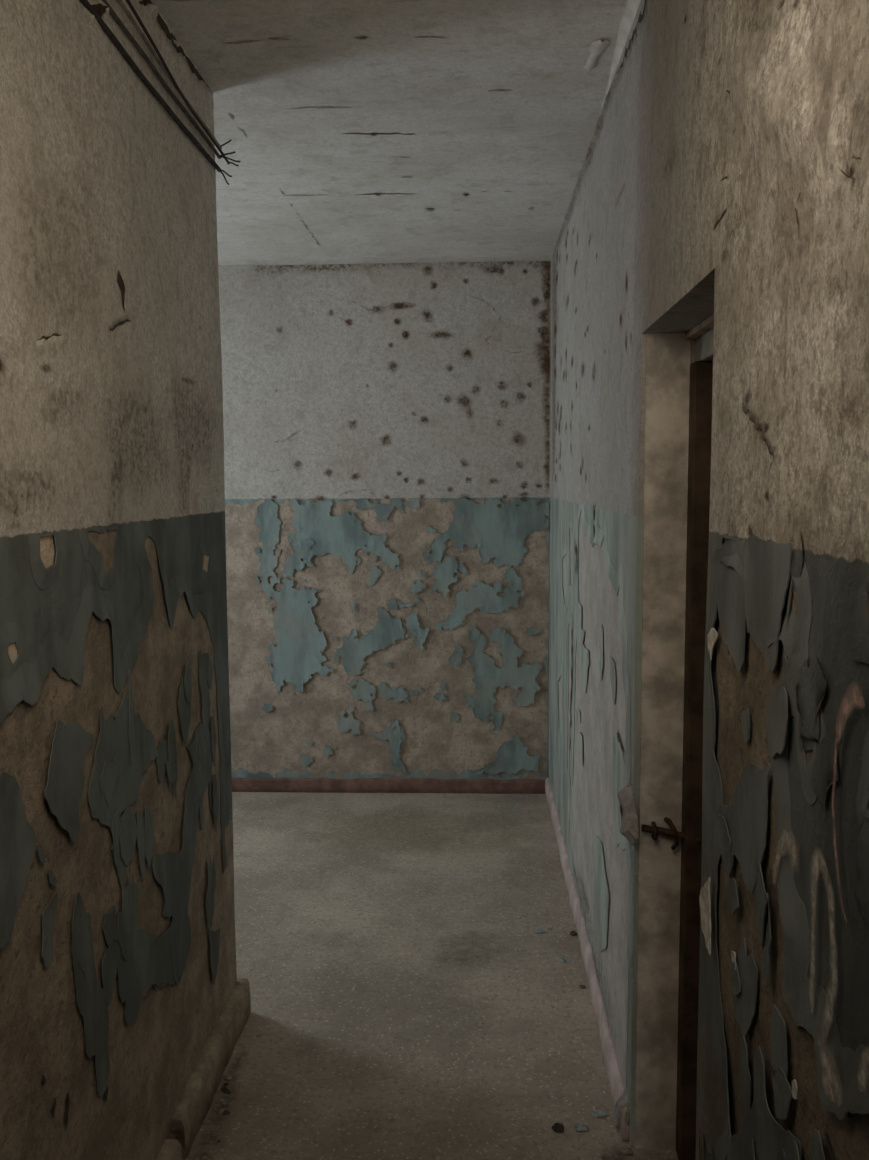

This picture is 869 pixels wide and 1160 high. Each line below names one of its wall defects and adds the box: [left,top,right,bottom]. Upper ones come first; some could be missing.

crack [107,265,131,331]
peeling [0,497,638,1160]
peeling [699,535,869,1160]